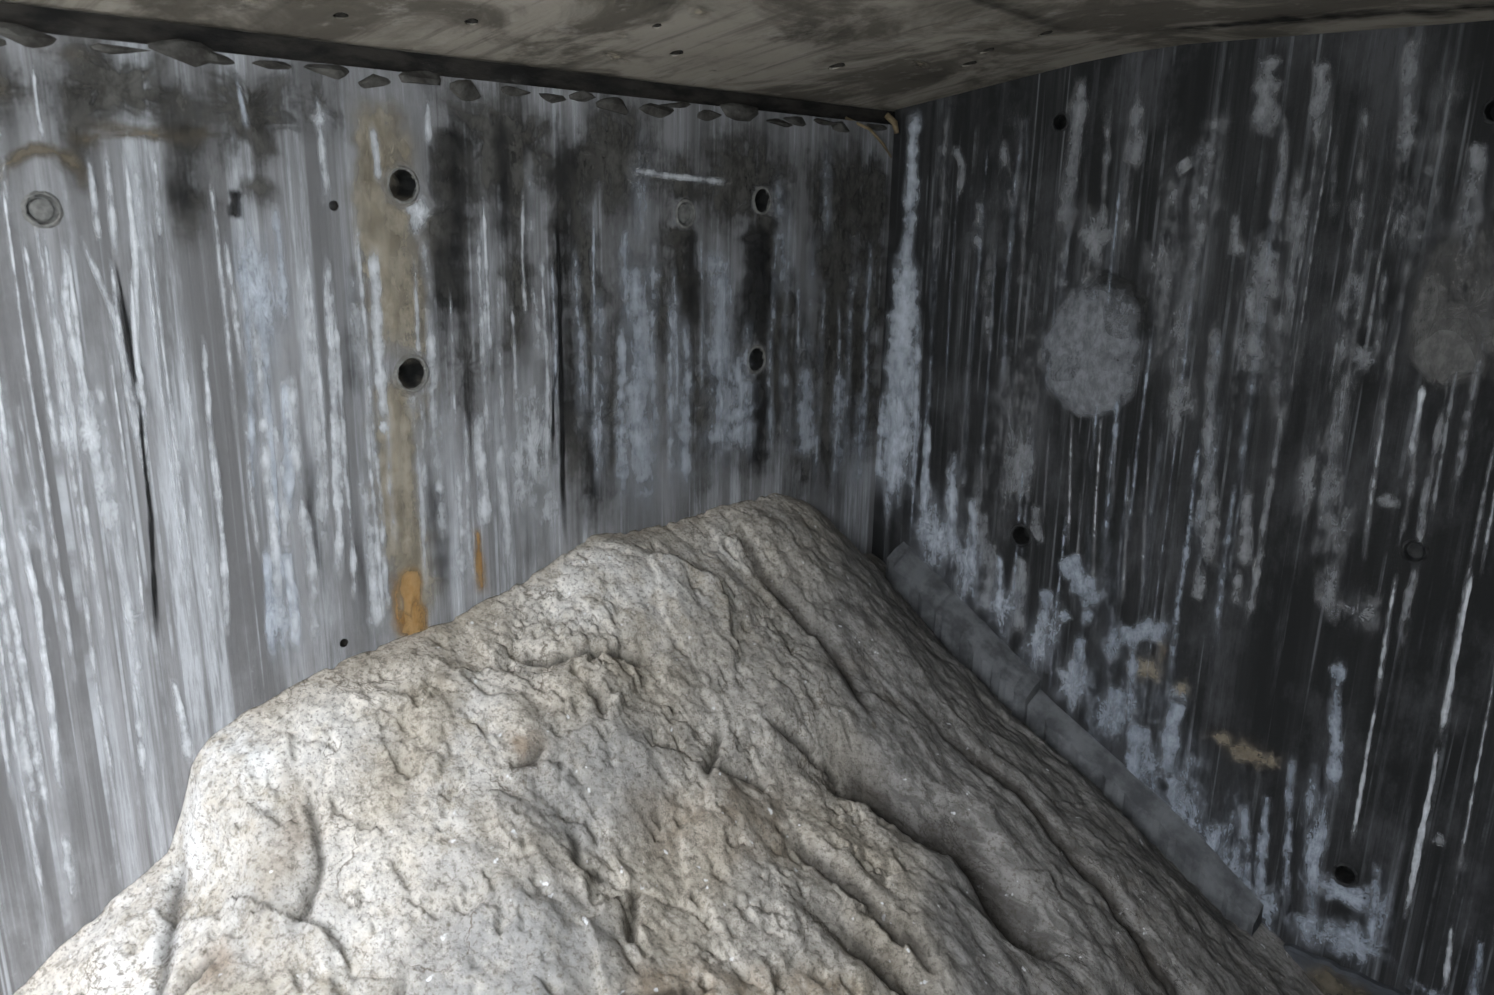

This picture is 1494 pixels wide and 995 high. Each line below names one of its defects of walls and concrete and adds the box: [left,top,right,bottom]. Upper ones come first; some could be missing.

leakage [1396,43,1418,157]
corrosion [353,106,427,352]
leakage [0,40,391,883]
corrosion [373,384,435,635]
corrosion [475,531,484,587]
leakage [407,57,1388,964]
leakage [1319,565,1417,677]
leakage [1298,193,1484,548]
leakage [1441,455,1494,726]
corrosion [1213,733,1277,767]
leakage [1407,756,1444,904]
leakage [1429,930,1452,995]